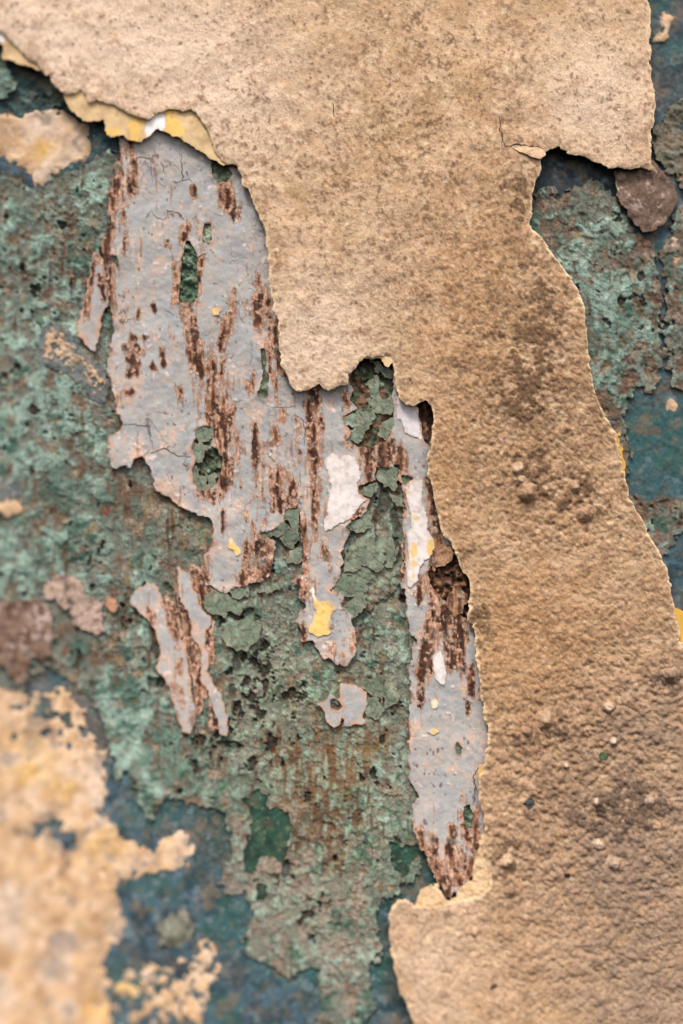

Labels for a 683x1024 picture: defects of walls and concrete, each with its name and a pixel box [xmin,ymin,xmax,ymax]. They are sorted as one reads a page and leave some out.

spalling [0,78,91,186]
corrosion [83,139,139,322]
peeling [513,146,546,159]
peeling [529,178,666,472]
peeling [613,98,683,232]
peeling [658,204,683,391]
corrosion [146,556,219,730]
corrosion [122,249,331,642]
peeling [0,129,490,1024]
corrosion [424,475,444,549]
corrosion [413,565,481,716]
corrosion [414,792,481,897]